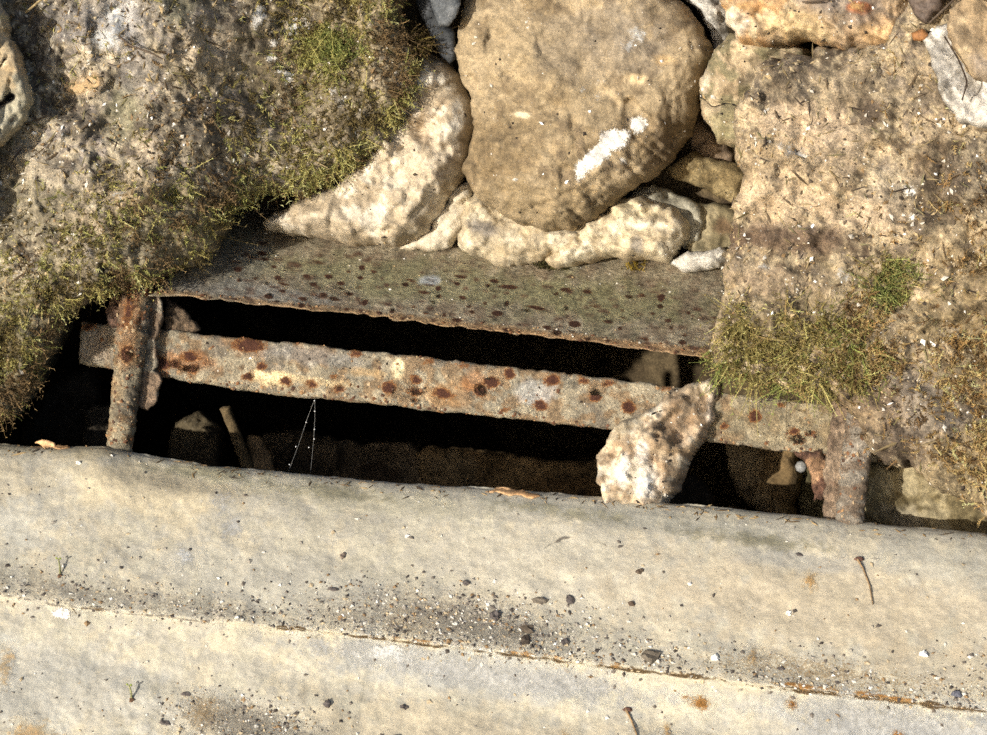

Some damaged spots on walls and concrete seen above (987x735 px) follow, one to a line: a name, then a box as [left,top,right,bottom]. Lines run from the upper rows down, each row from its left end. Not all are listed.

corrosion [257,251,712,356]
corrosion [81,284,521,448]
corrosion [525,372,620,430]
corrosion [620,385,675,414]
corrosion [749,410,765,425]
corrosion [783,417,881,522]